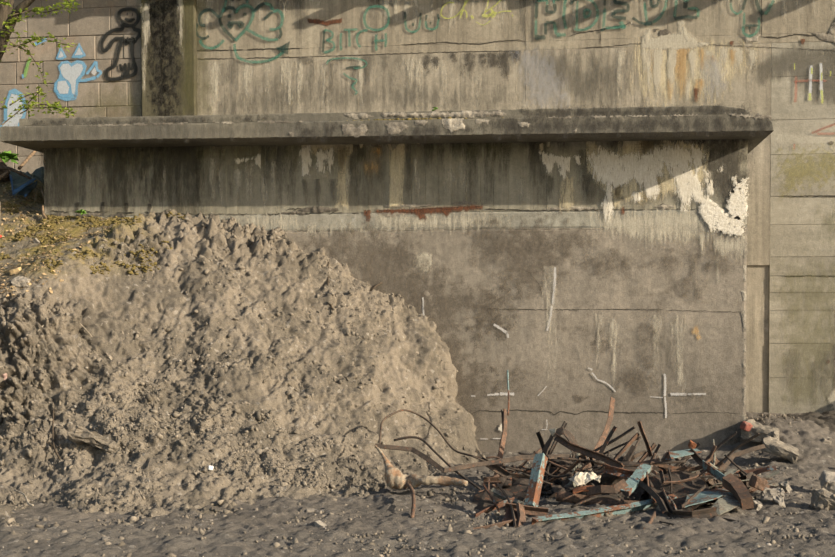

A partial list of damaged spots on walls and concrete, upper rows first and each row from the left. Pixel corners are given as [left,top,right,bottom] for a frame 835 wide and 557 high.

leakage [141,0,205,123]
leakage [210,63,221,103]
leakage [281,62,303,104]
leakage [407,55,444,85]
leakage [451,51,521,76]
leakage [482,20,770,275]
leakage [367,124,486,235]
corrosion [364,205,483,222]
peeling [539,144,749,301]
crack [472,409,735,417]